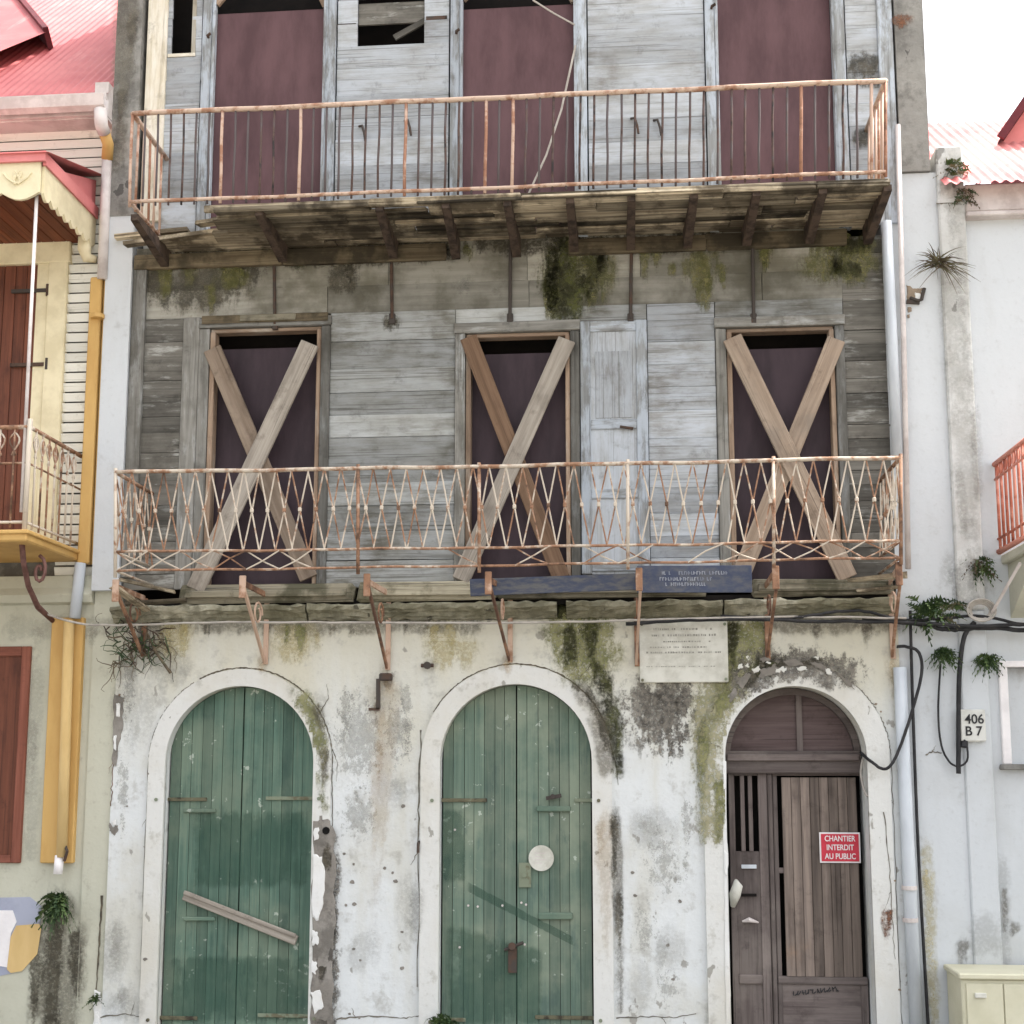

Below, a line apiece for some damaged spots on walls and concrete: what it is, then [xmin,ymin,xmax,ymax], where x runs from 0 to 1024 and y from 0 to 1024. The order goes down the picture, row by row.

damp [399,235,626,320]
damp [826,238,871,277]
spalling [729,654,854,703]
spalling [112,694,124,767]
damp [559,623,865,837]
peeling [310,816,361,1024]
damp [615,893,623,940]
damp [30,913,81,1024]